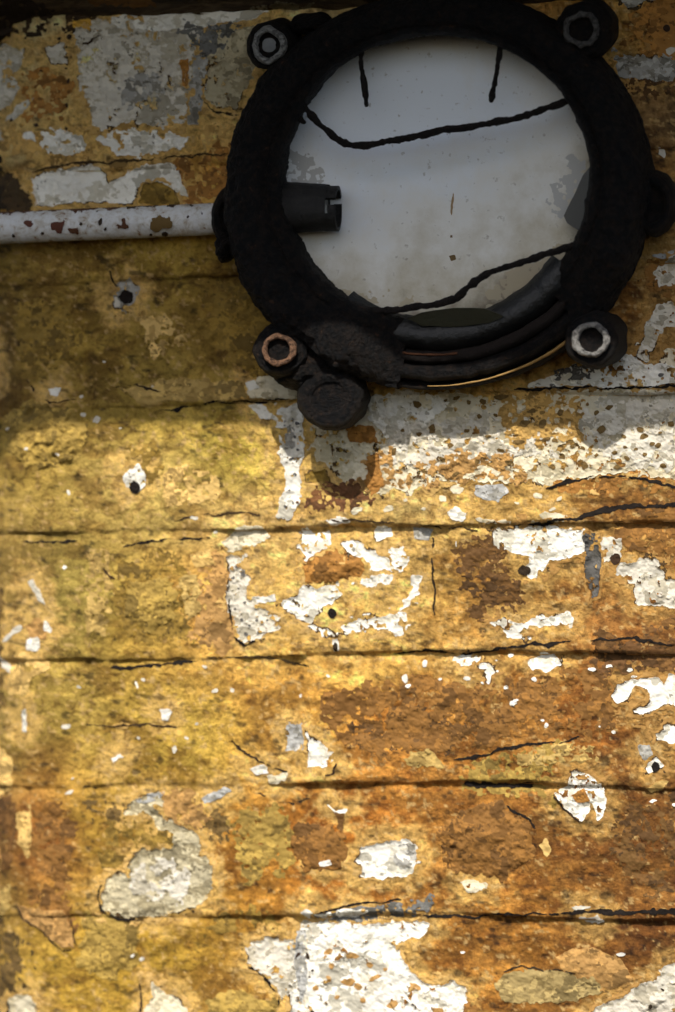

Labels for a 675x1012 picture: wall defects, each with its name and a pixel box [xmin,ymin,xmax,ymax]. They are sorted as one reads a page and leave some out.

spalling [0,1,315,231]
spalling [119,250,675,652]
crack [513,475,675,527]
crack [110,561,309,671]
rust [319,615,675,763]
rust [27,801,80,934]
spalling [91,782,224,927]
rust [335,810,345,831]
spalling [245,893,478,1012]
crack [444,736,579,829]
crack [422,908,675,919]
rust [571,788,590,803]